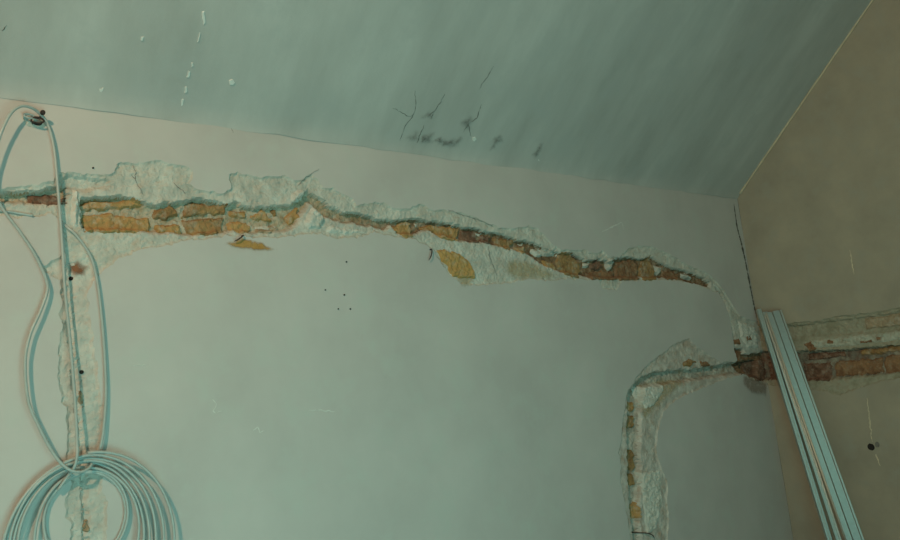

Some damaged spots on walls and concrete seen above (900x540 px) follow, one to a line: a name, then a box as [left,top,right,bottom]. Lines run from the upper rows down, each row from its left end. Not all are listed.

flaking render [0,160,779,540]
flaking render [787,307,900,395]